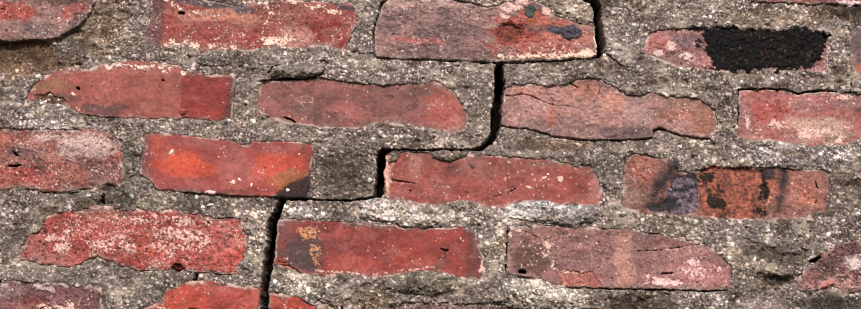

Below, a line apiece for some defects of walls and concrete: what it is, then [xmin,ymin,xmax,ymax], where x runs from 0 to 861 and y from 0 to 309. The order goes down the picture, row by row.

crack [591,5,602,59]
crack [262,64,324,82]
crack [475,63,554,151]
crack [376,152,415,198]
crack [264,201,300,309]